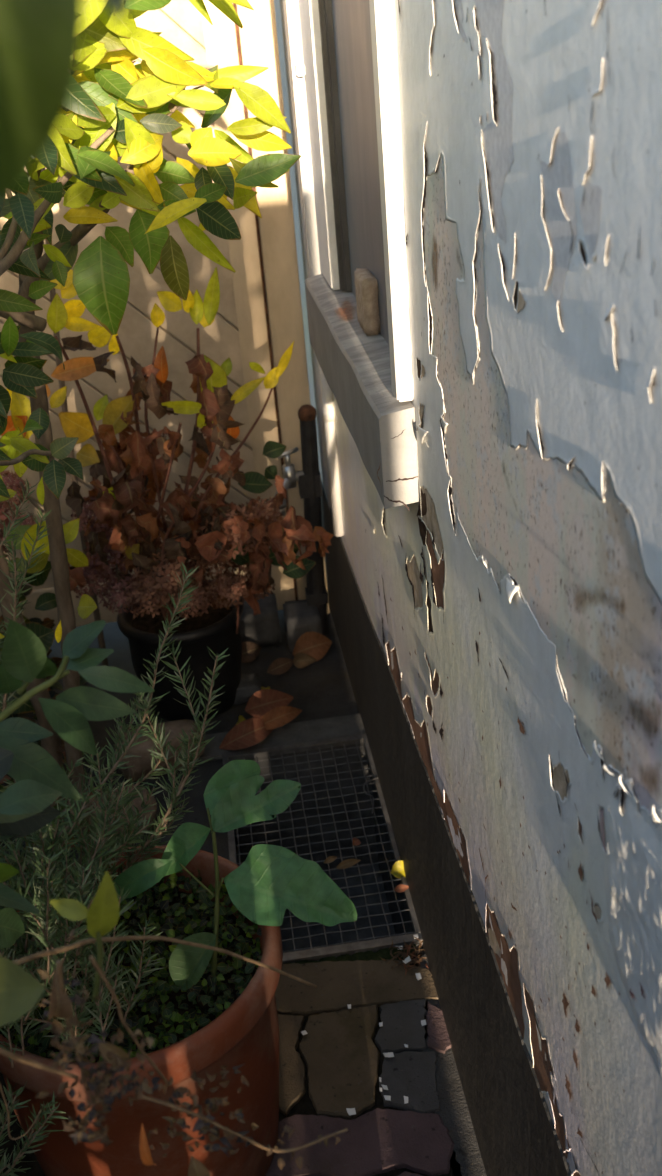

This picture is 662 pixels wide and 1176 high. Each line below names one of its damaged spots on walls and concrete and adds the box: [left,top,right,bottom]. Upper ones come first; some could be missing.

crack [428,0,436,76]
crack [466,6,481,80]
crack [558,0,657,370]
crack [490,210,516,301]
crack [556,299,564,331]
peeling [398,0,662,829]
crack [647,367,659,402]
peeling [597,804,609,857]
peeling [377,578,582,1176]
peeling [568,861,603,924]